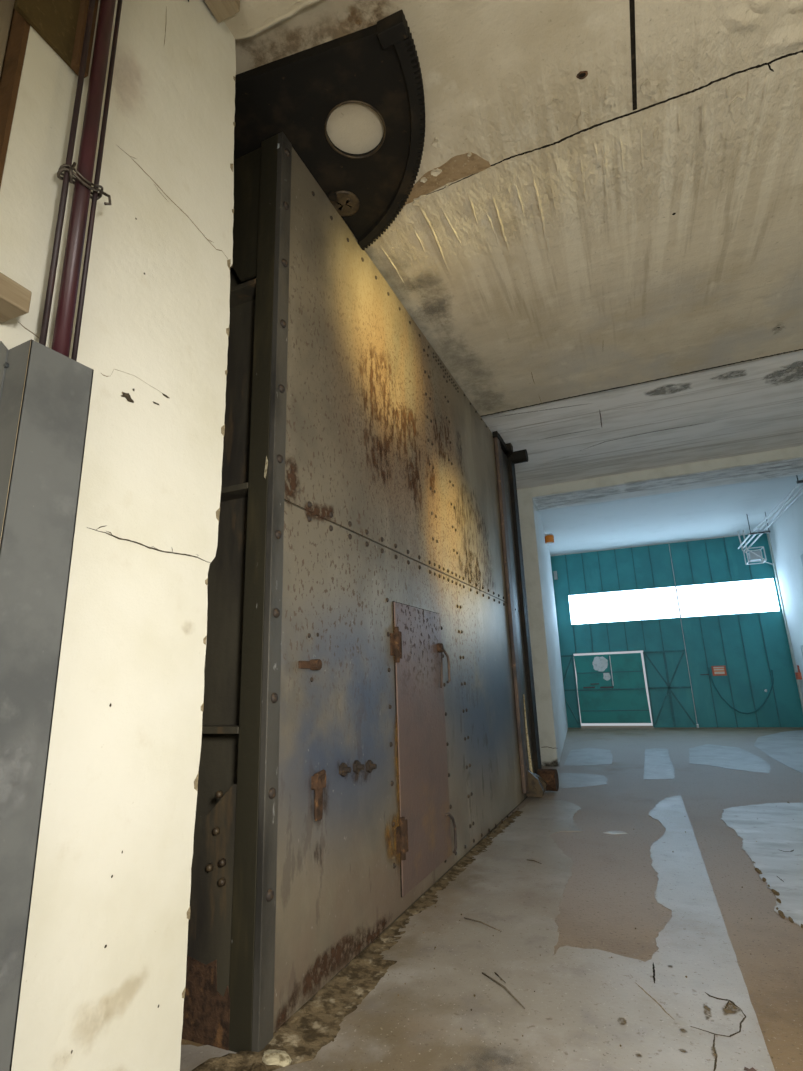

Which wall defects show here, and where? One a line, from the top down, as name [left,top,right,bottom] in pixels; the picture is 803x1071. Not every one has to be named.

crack [427,50,803,195]
peeling [401,152,491,274]
corrosion [360,350,462,510]
damp [646,384,689,396]
damp [765,361,803,384]
crack [89,526,211,563]
corrosion [285,460,333,521]
peeling [273,748,775,1071]
peeling [720,802,803,928]
peeling [180,1045,236,1071]
corrosion [276,918,387,1030]
crack [636,963,746,1071]